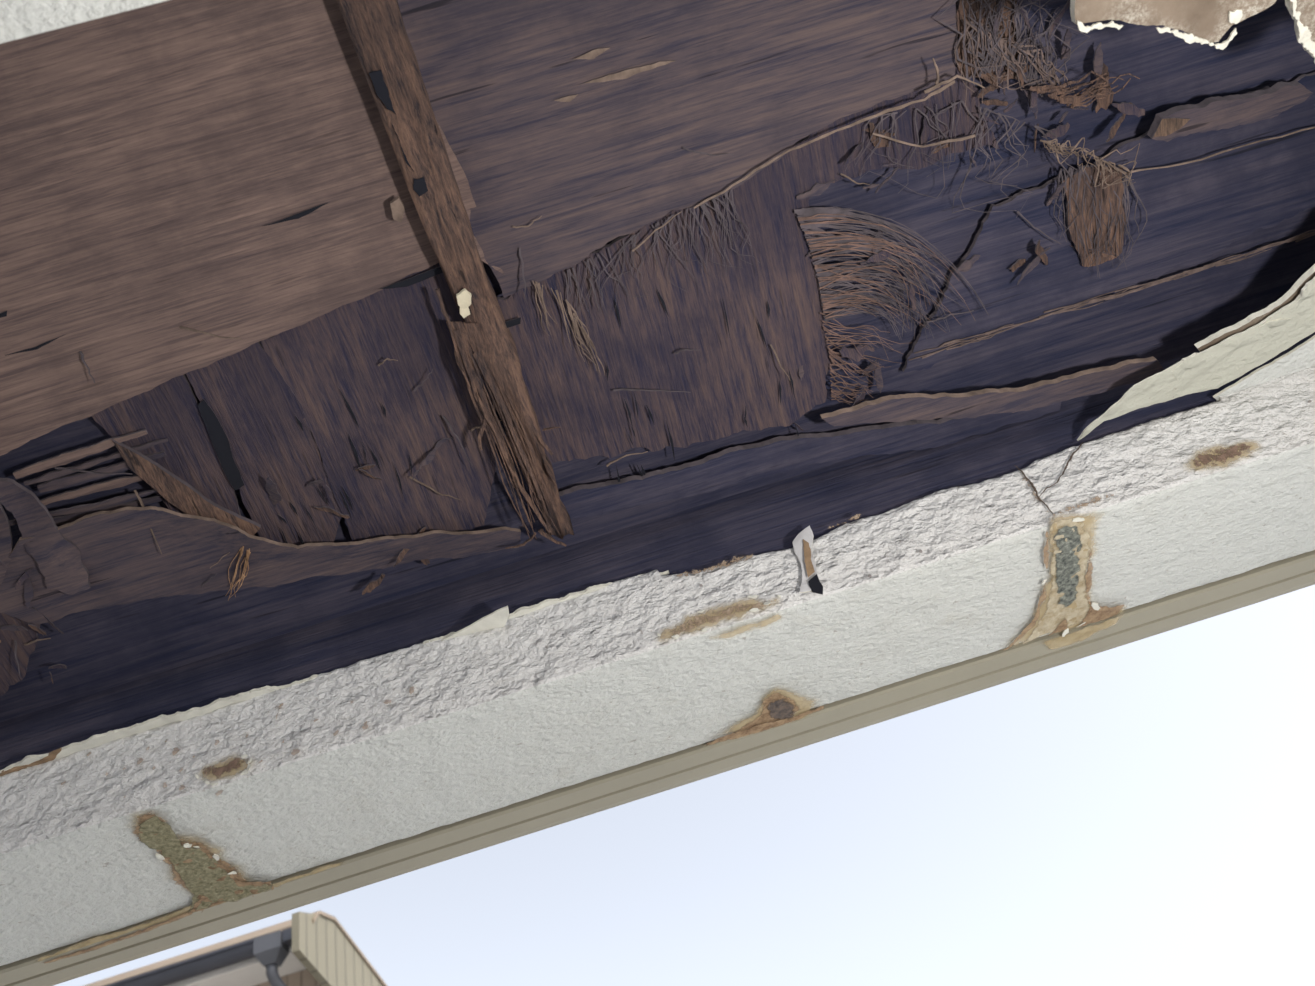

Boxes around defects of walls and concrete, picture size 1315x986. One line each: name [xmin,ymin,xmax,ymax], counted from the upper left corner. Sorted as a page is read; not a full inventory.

flaking render [1077,277,1315,441]
crack [1016,443,1113,516]
spalling [659,554,753,587]
peeling [792,525,823,594]
peeling [423,582,613,645]
peeling [0,668,345,777]
rust [706,690,824,745]